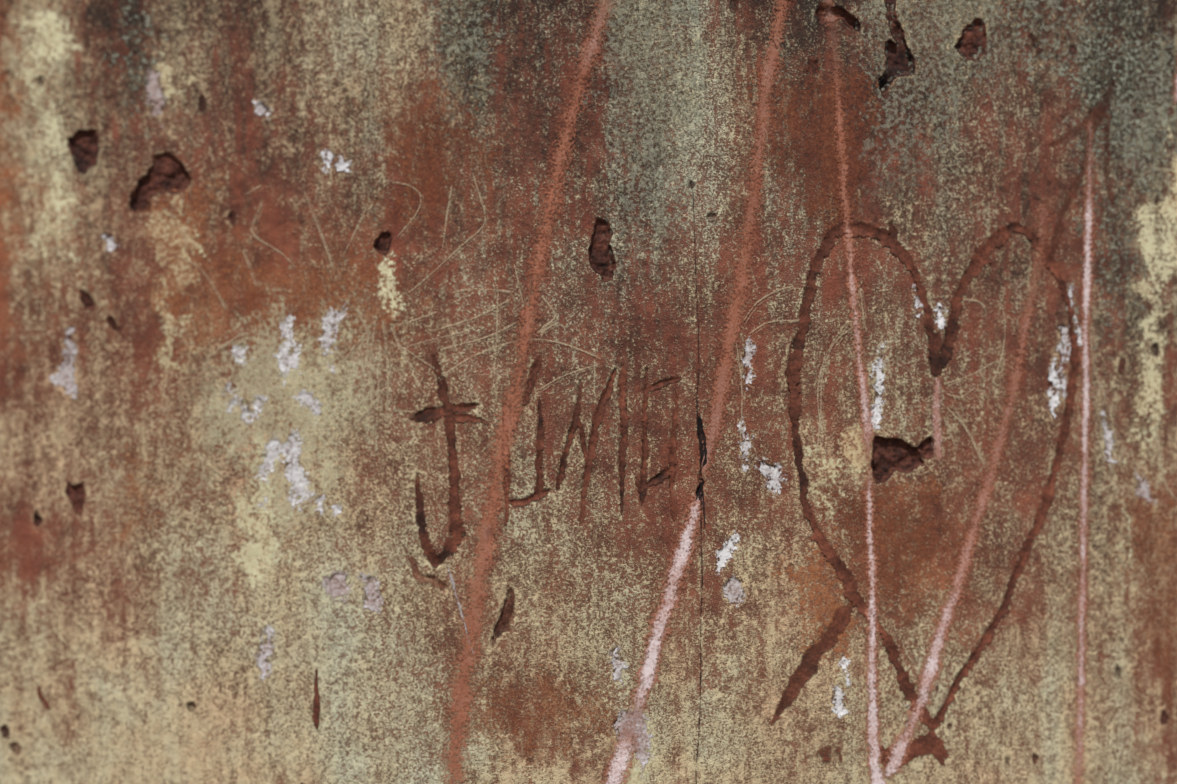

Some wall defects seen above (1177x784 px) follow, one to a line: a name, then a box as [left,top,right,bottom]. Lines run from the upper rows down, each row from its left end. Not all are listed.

spalling [67,129,99,175]
spalling [129,152,191,213]
spalling [868,342,934,484]
peeling [880,704,952,768]